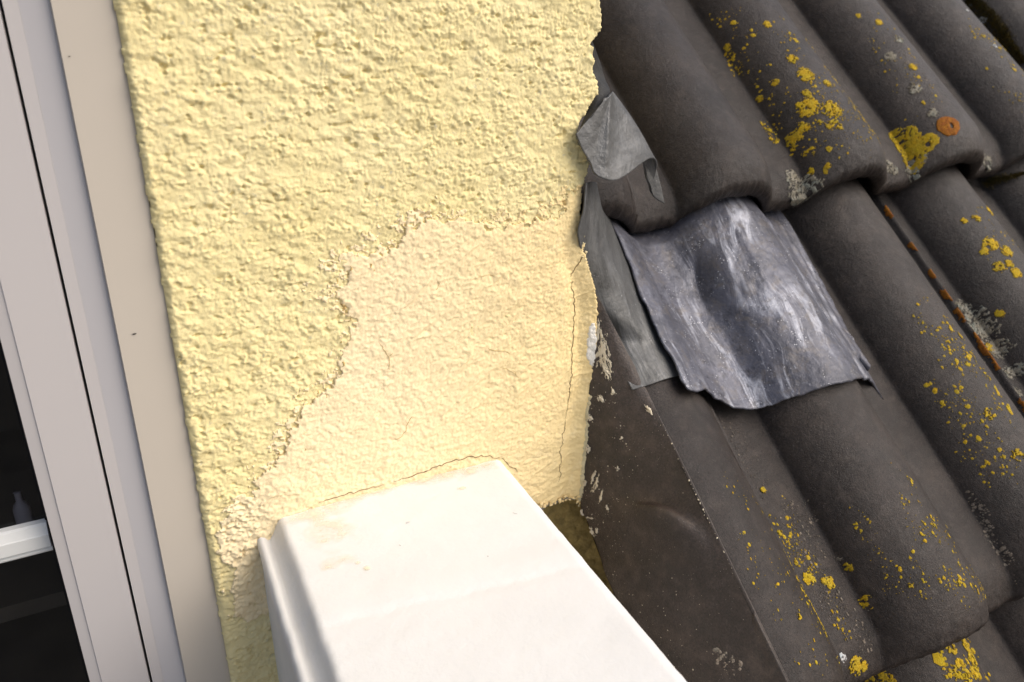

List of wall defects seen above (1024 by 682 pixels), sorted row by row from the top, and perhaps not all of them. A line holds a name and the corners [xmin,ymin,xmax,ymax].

crack [558,254,584,482]
crack [323,455,516,502]
spalling [538,395,592,510]